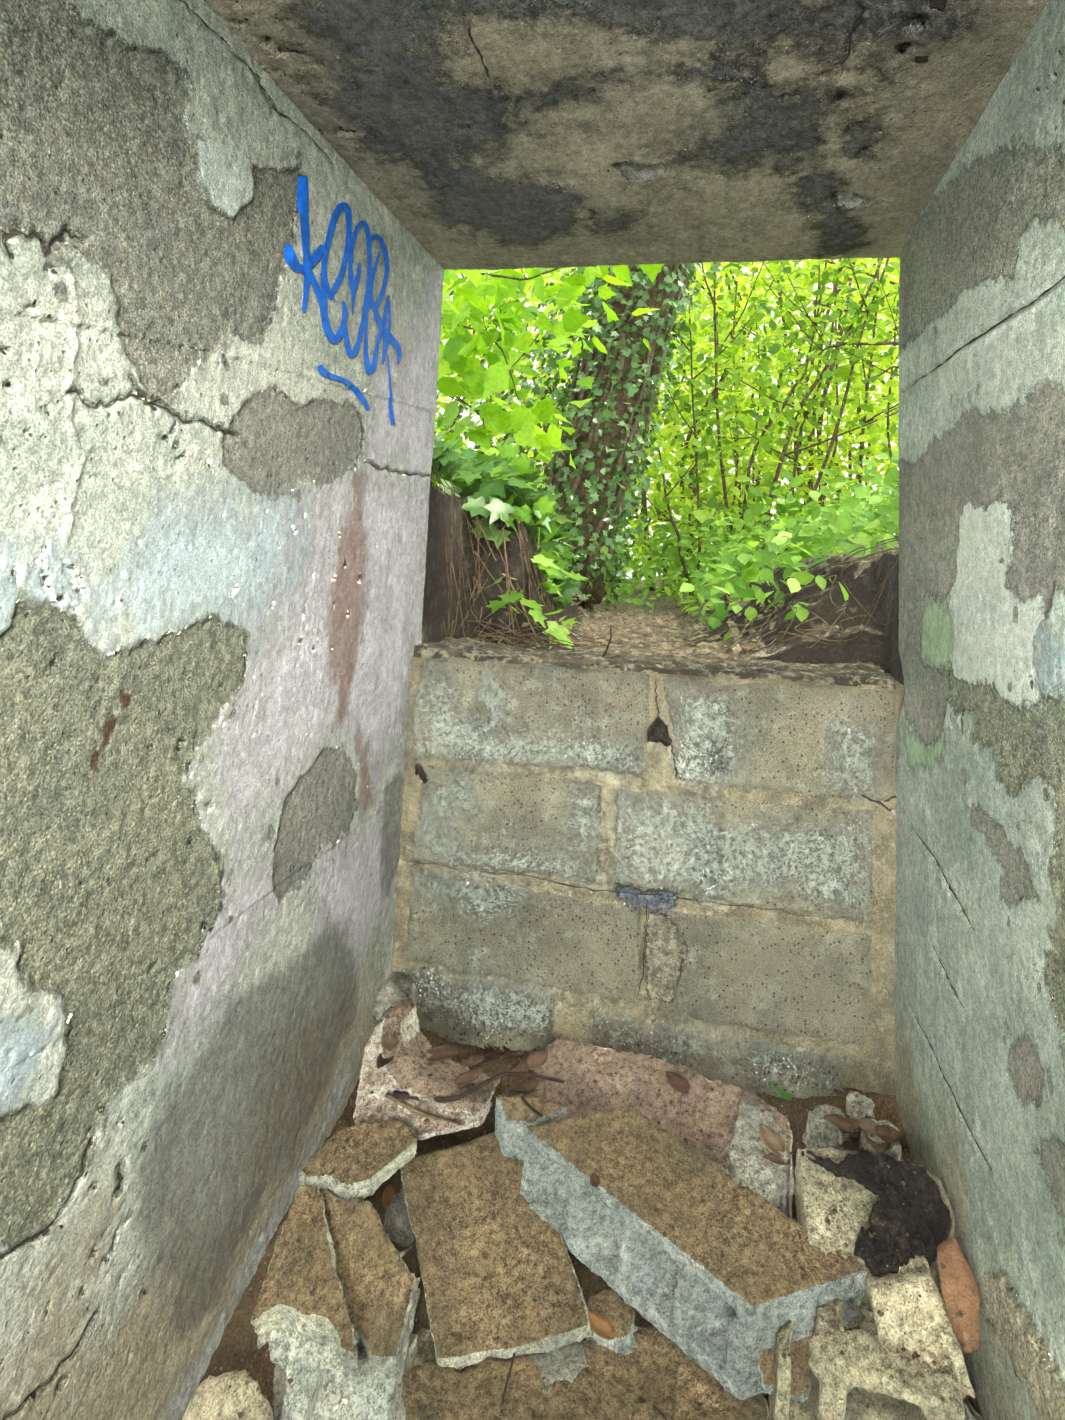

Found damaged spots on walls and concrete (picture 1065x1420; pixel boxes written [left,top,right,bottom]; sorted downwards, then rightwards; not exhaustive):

crack [1,229,83,259]
spalling [0,0,303,459]
crack [69,378,235,435]
crack [364,462,428,477]
water stain [291,0,976,258]
crack [836,0,865,100]
spalling [898,135,1065,356]
crack [903,276,1065,393]
corrosion [331,477,364,718]
spalling [0,546,250,1249]
spalling [268,745,358,902]
spalling [898,379,1065,1108]